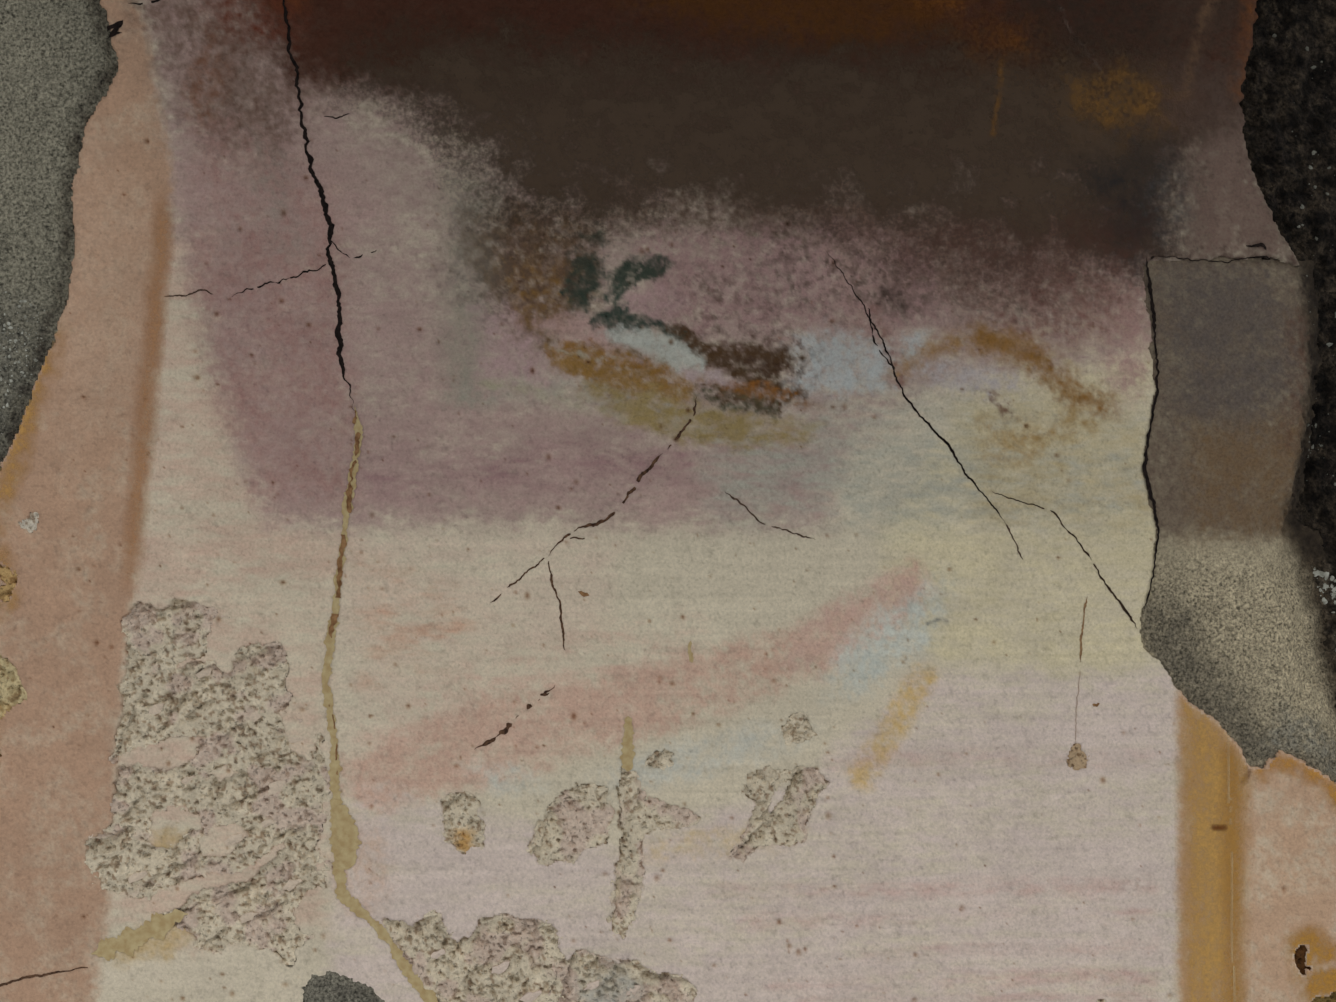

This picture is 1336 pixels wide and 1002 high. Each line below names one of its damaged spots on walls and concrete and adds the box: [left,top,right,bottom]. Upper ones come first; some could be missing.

crack [107,0,160,38]
crack [164,0,438,1002]
crack [490,397,697,650]
crack [827,243,1270,744]
crack [474,685,555,750]
flaking render [84,599,333,965]
flaking render [441,791,486,854]
flaking render [526,748,703,939]
flaking render [728,765,829,863]
flaking render [383,909,698,1002]
flaking render [1294,945,1311,975]
rust [1291,929,1336,999]